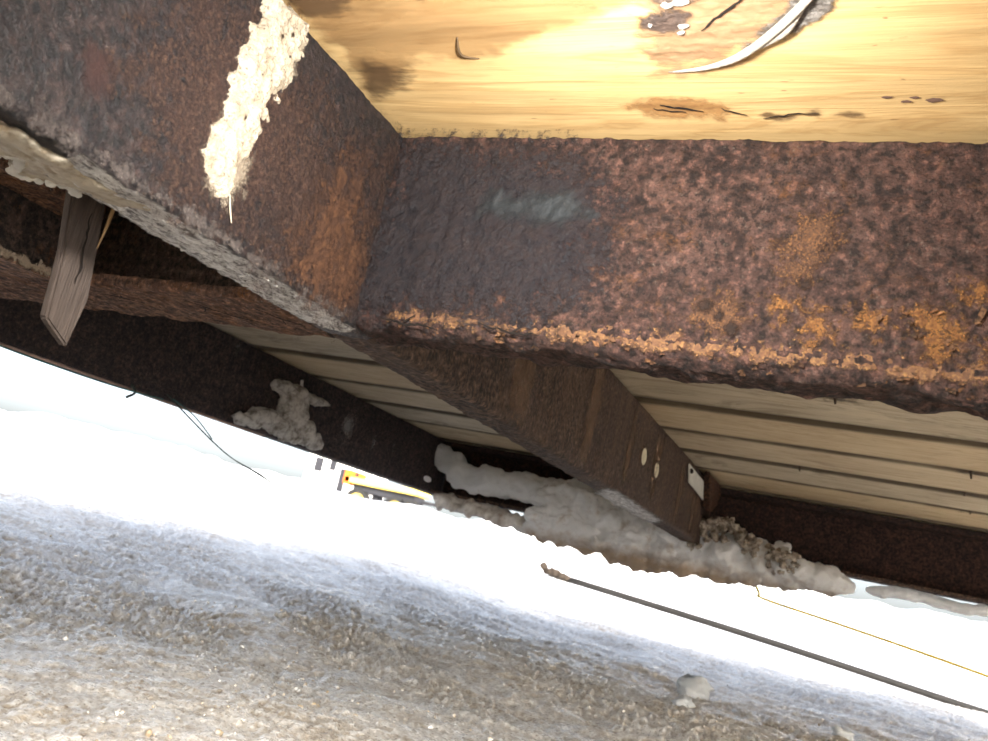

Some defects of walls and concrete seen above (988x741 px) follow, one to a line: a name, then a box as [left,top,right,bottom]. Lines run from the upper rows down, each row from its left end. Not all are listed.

damp [292,0,347,16]
damp [362,64,404,97]
crack [763,112,861,120]
corrosion [101,0,402,325]